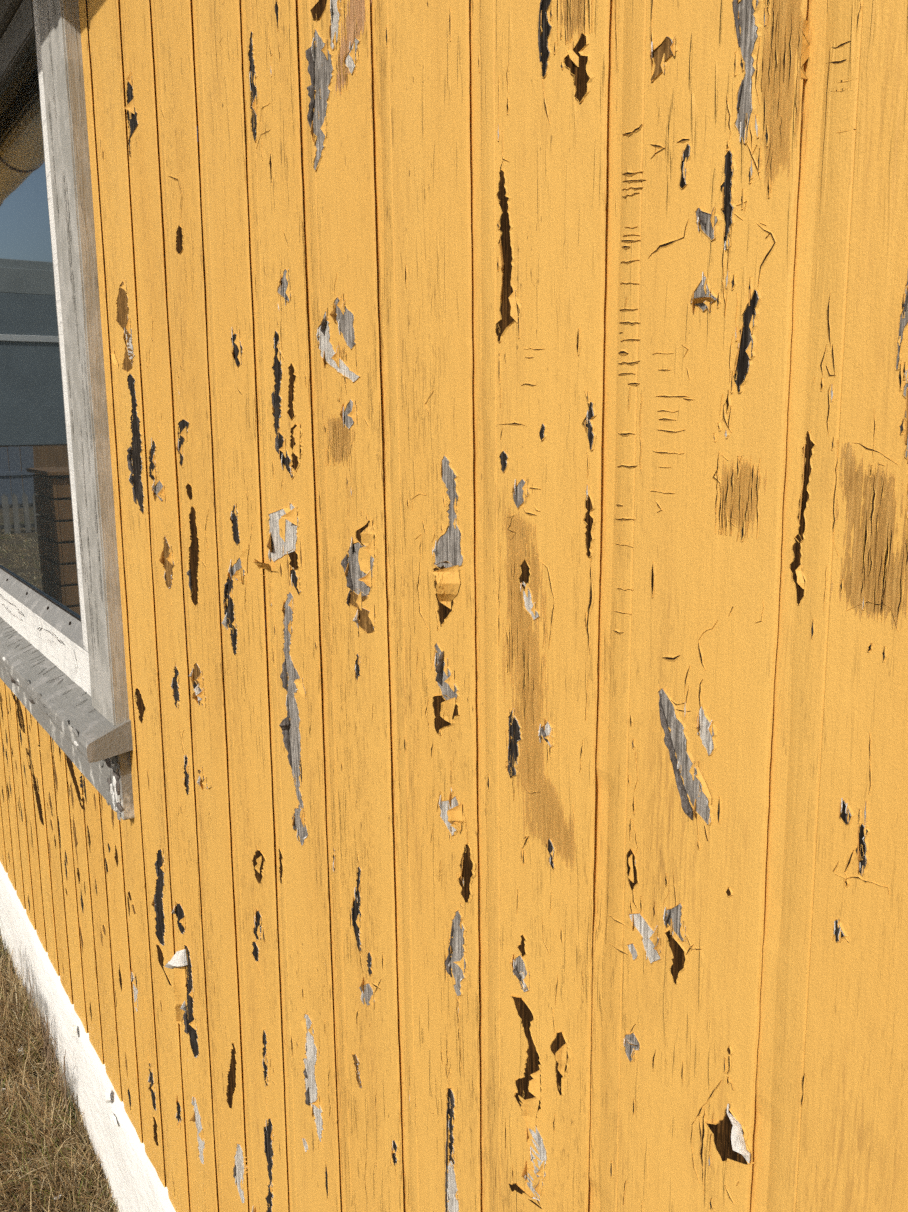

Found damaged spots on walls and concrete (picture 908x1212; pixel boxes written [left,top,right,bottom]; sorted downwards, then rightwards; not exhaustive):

peeling [305,0,372,171]
peeling [538,0,594,124]
peeling [690,0,767,433]
peeling [111,280,166,517]
peeling [159,483,209,609]
peeling [222,263,311,846]
peeling [341,511,377,681]
peeling [407,456,465,737]
peeling [609,715,702,985]
peeling [657,666,722,850]
peeling [505,935,571,1209]
peeling [690,1046,755,1211]